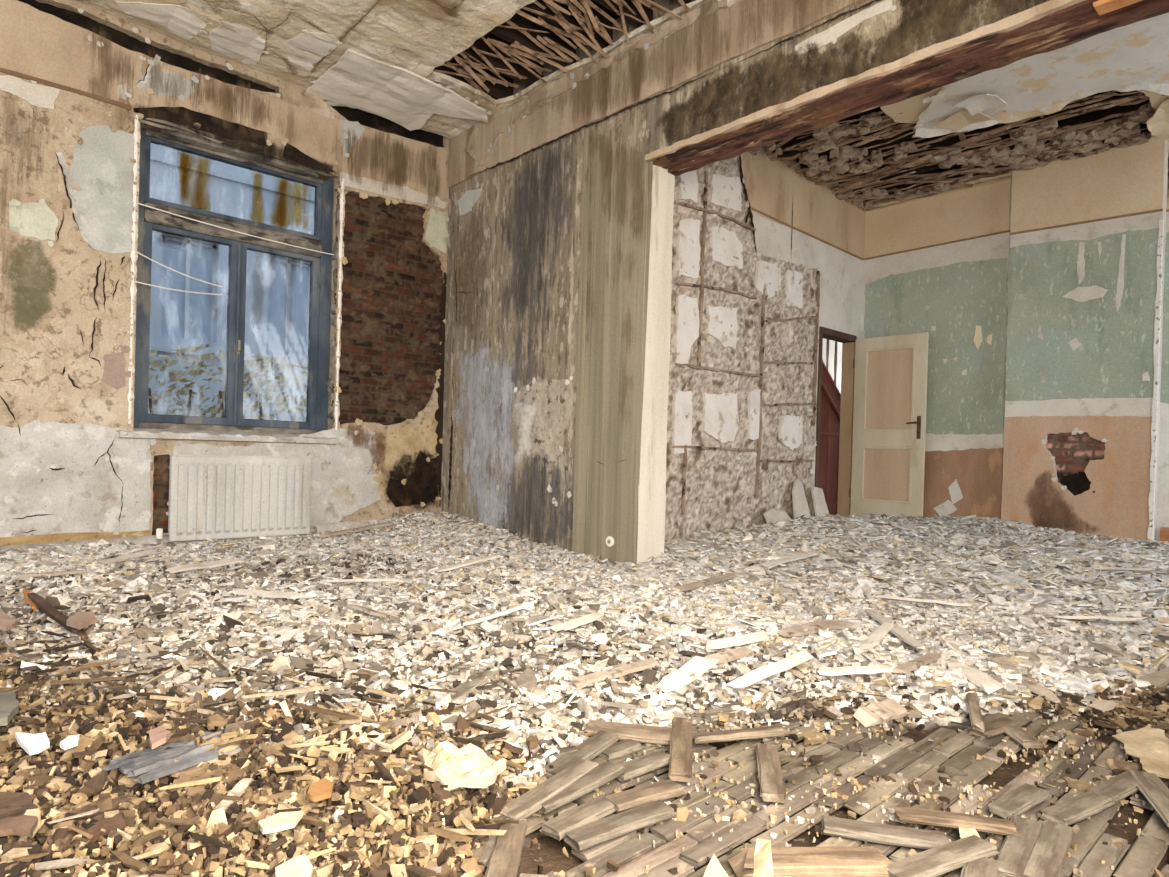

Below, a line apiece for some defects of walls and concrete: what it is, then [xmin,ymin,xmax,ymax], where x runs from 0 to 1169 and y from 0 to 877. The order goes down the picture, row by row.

crack [136,54,161,89]
crack [203,0,379,78]
water stain [658,0,1049,144]
flaking render [645,0,1086,162]
flaking render [912,12,1169,140]
corrosion [180,152,209,211]
corrosion [252,173,307,227]
water stain [11,243,54,328]
flaking render [0,0,482,537]
water stain [455,141,573,549]
crack [94,437,126,526]
flaking render [1041,428,1108,496]